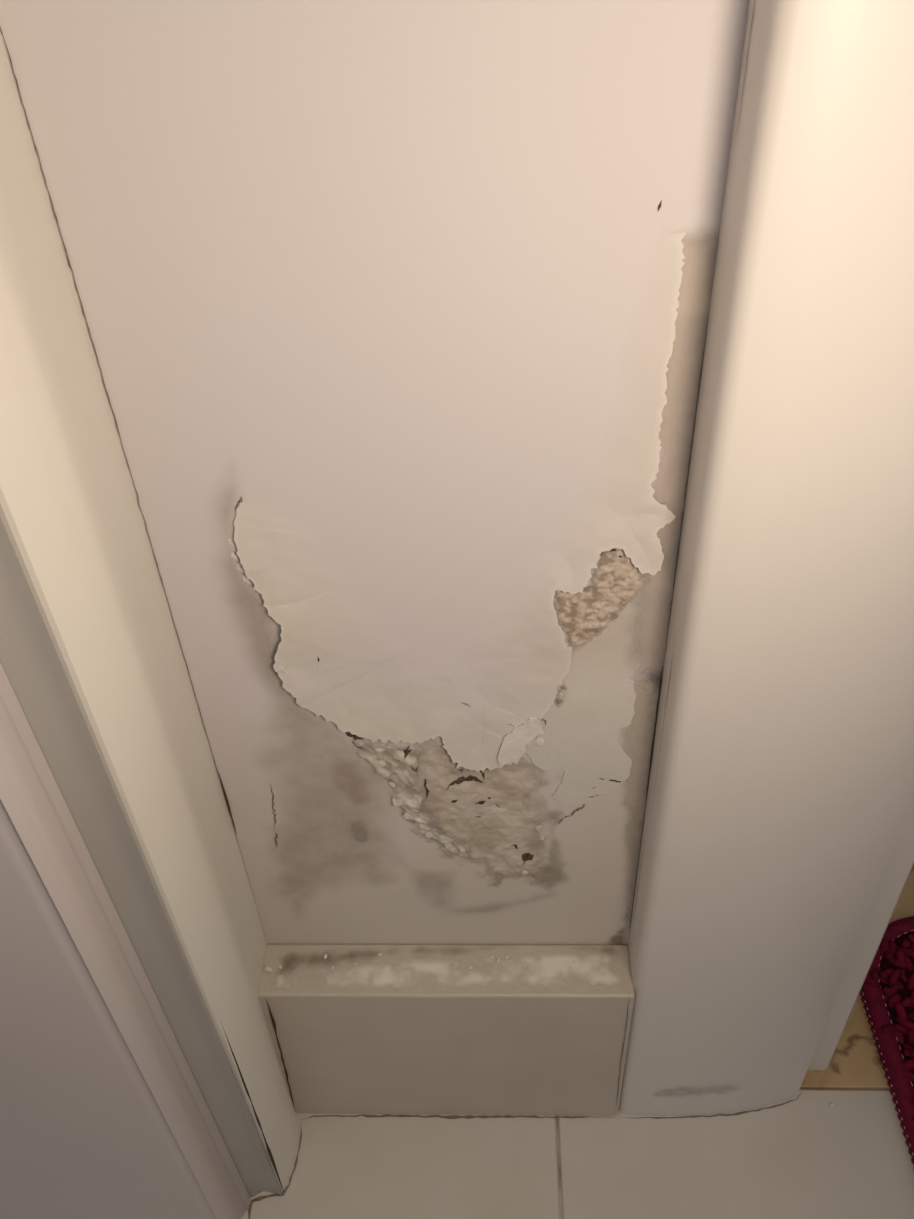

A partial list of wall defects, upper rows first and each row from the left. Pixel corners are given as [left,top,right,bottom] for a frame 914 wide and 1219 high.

peeling [228,224,686,885]